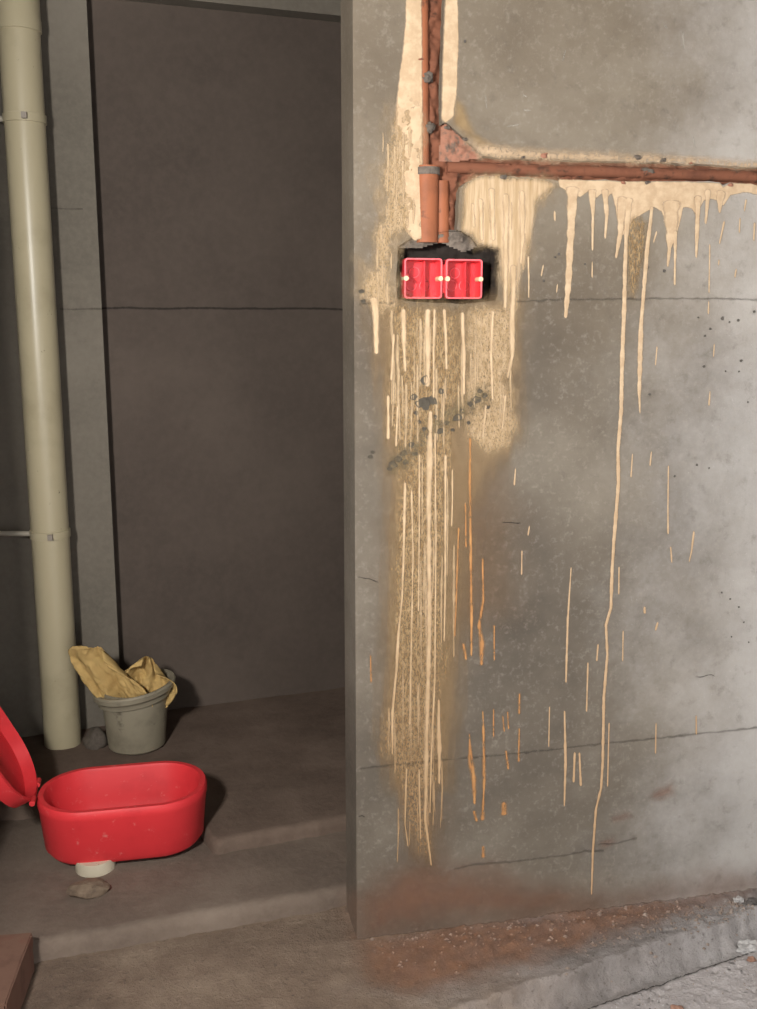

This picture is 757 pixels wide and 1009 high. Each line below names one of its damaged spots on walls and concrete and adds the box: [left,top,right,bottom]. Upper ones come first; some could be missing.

rust [371,906,663,984]